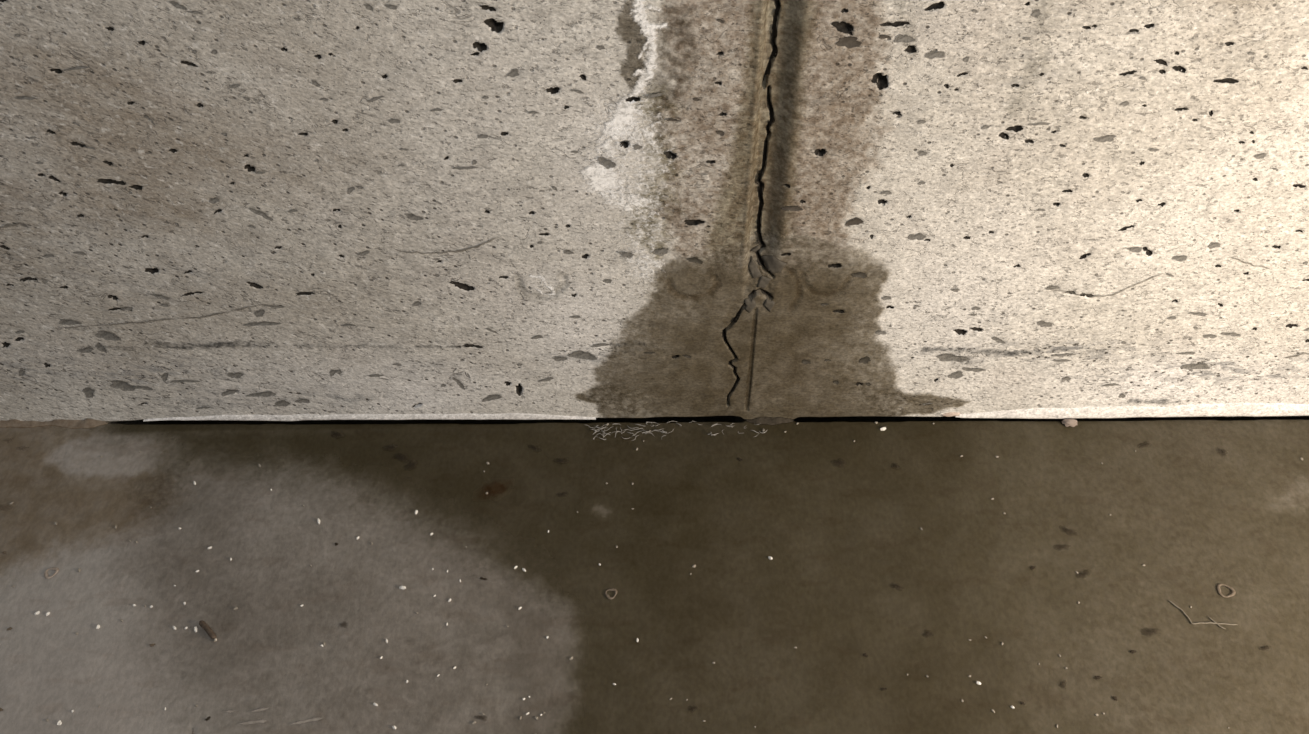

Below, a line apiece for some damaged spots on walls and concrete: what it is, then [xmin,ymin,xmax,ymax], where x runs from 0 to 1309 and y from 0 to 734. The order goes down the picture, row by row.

leakage [581,0,667,278]
crack [755,0,780,266]
leakage [112,250,1309,734]
crack [722,308,741,400]